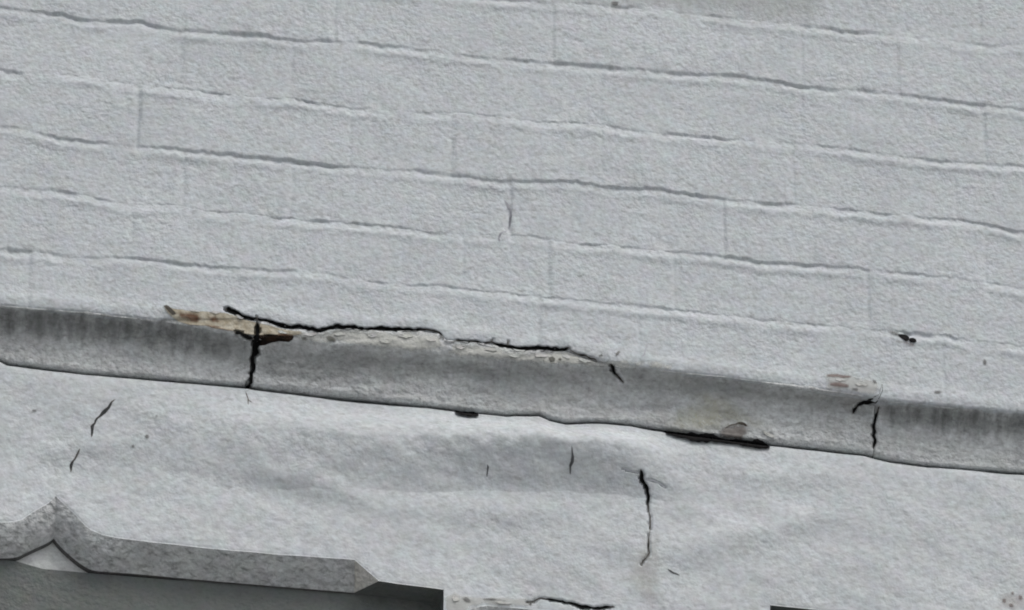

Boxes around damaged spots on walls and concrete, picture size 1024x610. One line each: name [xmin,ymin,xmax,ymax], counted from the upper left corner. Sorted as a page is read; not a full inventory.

peeling [164,305,669,368]
crack [225,307,624,404]
crack [70,400,114,471]
crack [853,385,883,448]
crack [622,468,680,576]